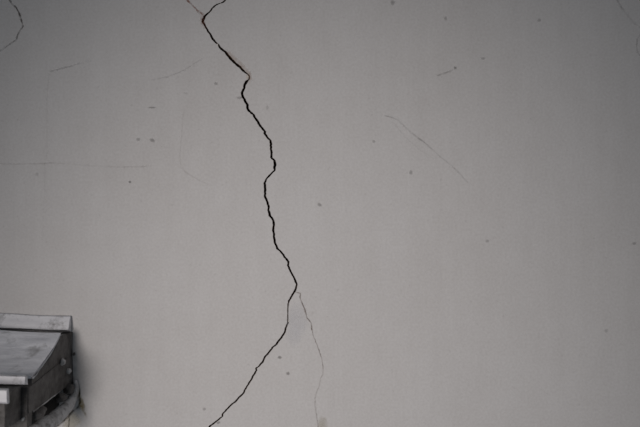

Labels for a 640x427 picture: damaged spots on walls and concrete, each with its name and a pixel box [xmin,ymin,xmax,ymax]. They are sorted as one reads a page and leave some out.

crack [187,0,306,427]